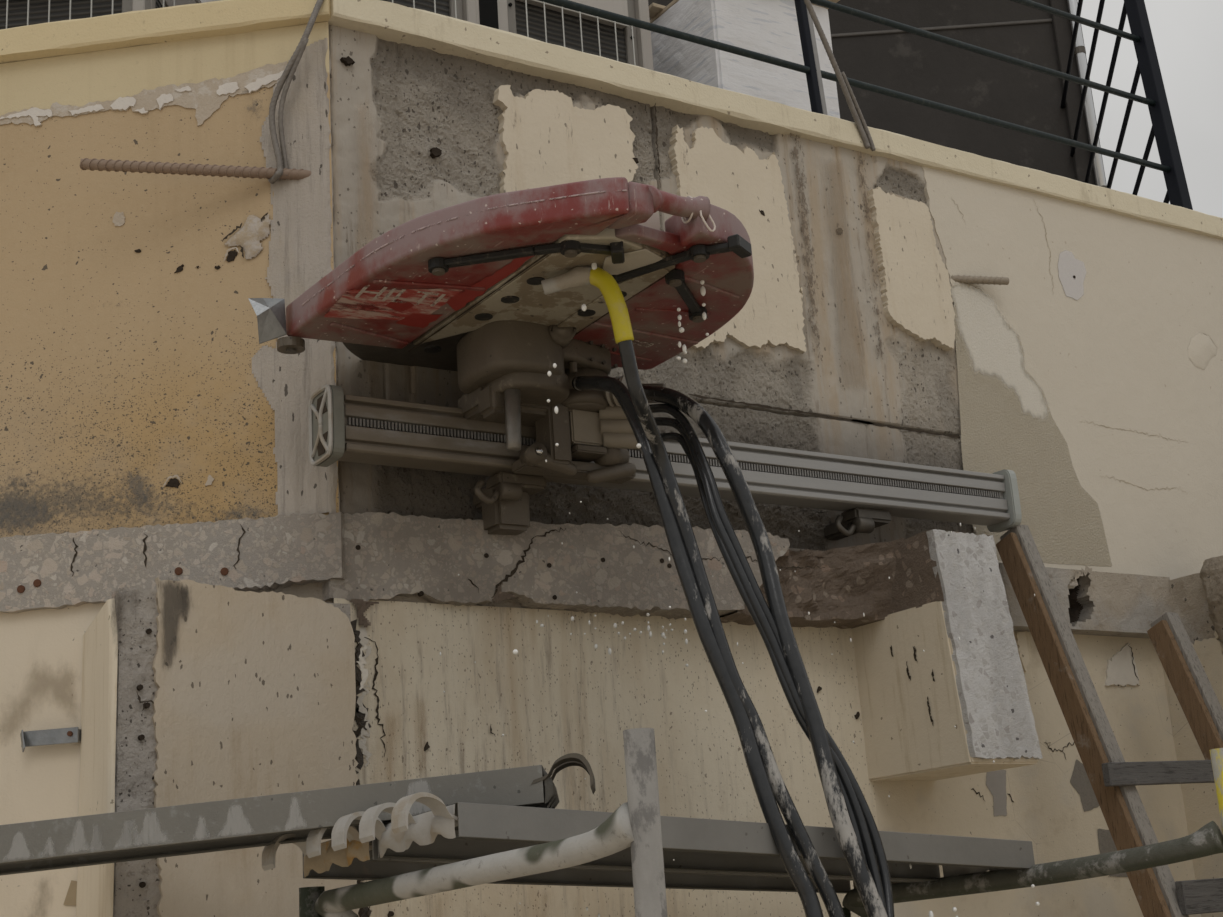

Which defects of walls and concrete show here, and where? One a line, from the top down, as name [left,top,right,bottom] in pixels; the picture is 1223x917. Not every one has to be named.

spalling [0,25,1009,470]
spalling [252,335,491,520]
spalling [529,482,664,528]
spalling [682,495,711,530]
crack [70,538,78,576]
crack [141,534,149,567]
crack [233,524,246,569]
crack [468,527,566,598]
crack [351,619,386,785]
crack [357,880,371,917]